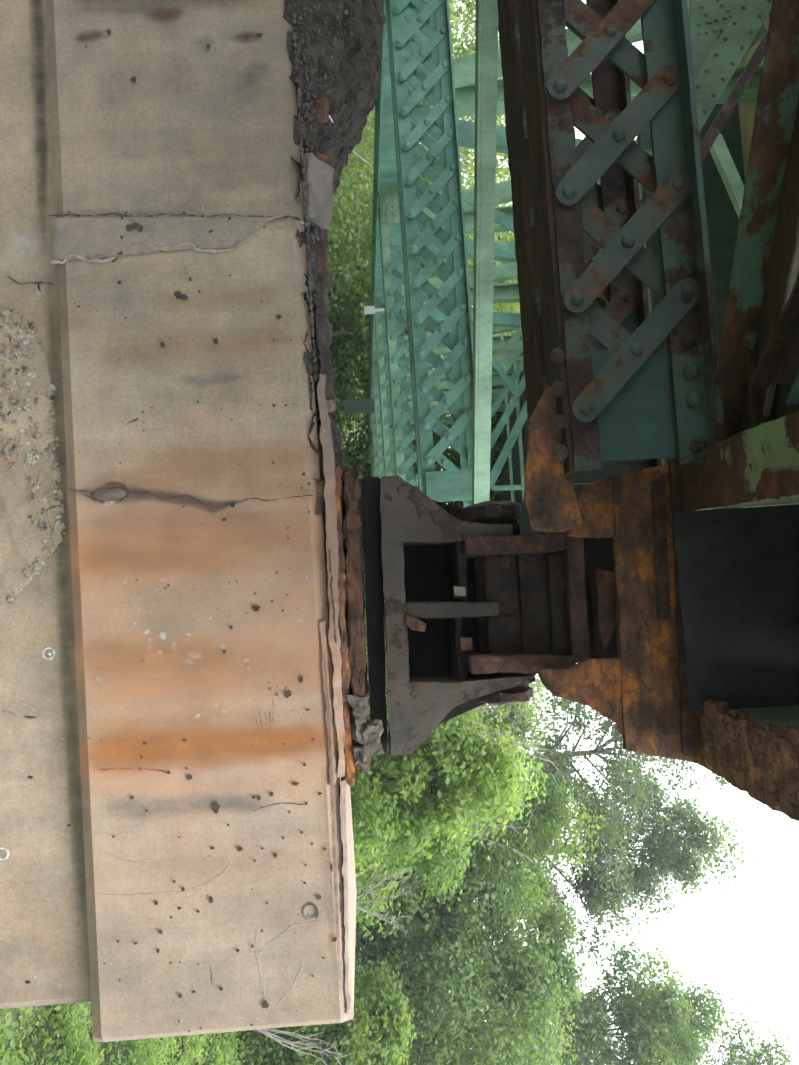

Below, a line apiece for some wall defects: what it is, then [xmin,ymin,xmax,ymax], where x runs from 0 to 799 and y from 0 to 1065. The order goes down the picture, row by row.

crack [48,211,272,219]
spalling [0,306,68,603]
crack [28,485,313,517]
rust [755,469,799,501]